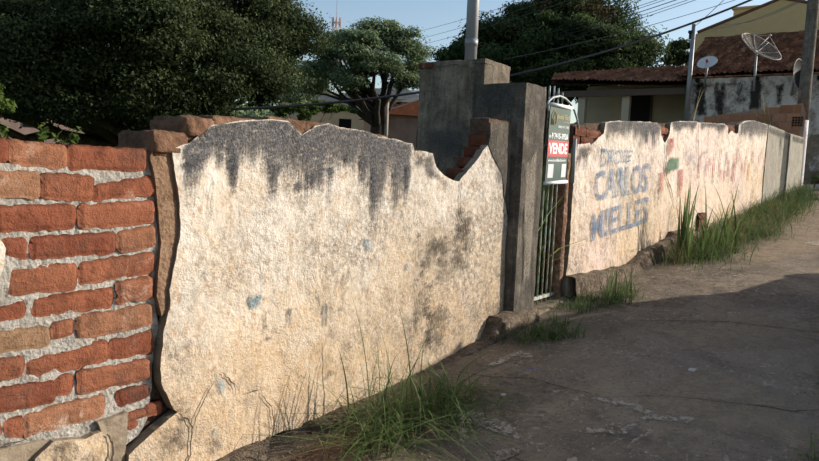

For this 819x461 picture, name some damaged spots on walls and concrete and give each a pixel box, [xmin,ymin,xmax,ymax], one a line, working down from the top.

water stain [183,120,461,224]
spalling [445,117,511,180]
water stain [608,121,661,147]
water stain [672,81,761,142]
water stain [741,121,804,146]
spalling [0,137,179,461]
water stain [411,208,475,350]
crack [179,372,279,461]